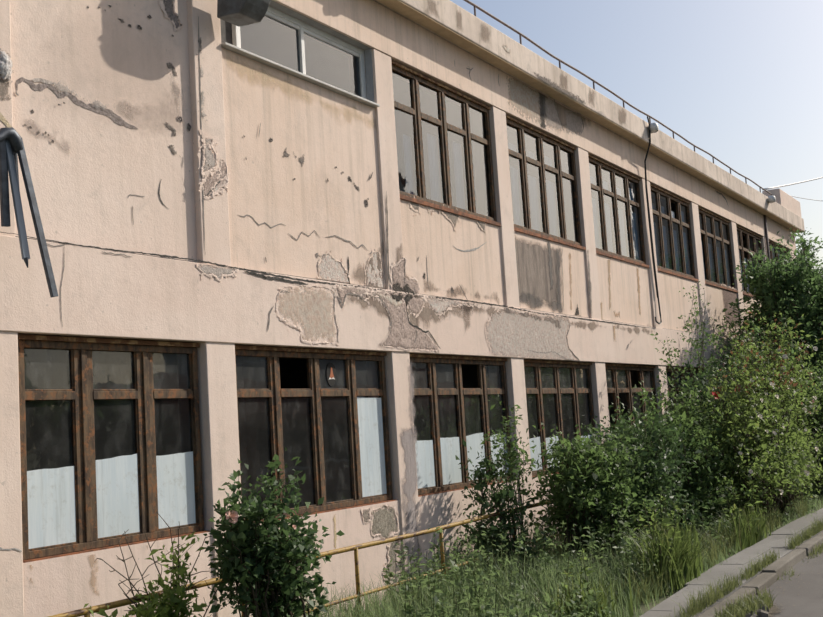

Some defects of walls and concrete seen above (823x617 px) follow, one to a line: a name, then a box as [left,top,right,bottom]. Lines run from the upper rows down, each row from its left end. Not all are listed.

flaking render [159,0,183,37]
spalling [15,77,138,129]
crack [196,16,204,158]
spalling [163,115,231,200]
crack [128,179,167,225]
crack [1,189,649,328]
water stain [355,246,383,282]
water stain [351,295,392,334]
flaking render [267,191,481,352]
water stain [407,237,597,330]
flaking render [484,307,580,361]
flaking render [359,504,402,582]